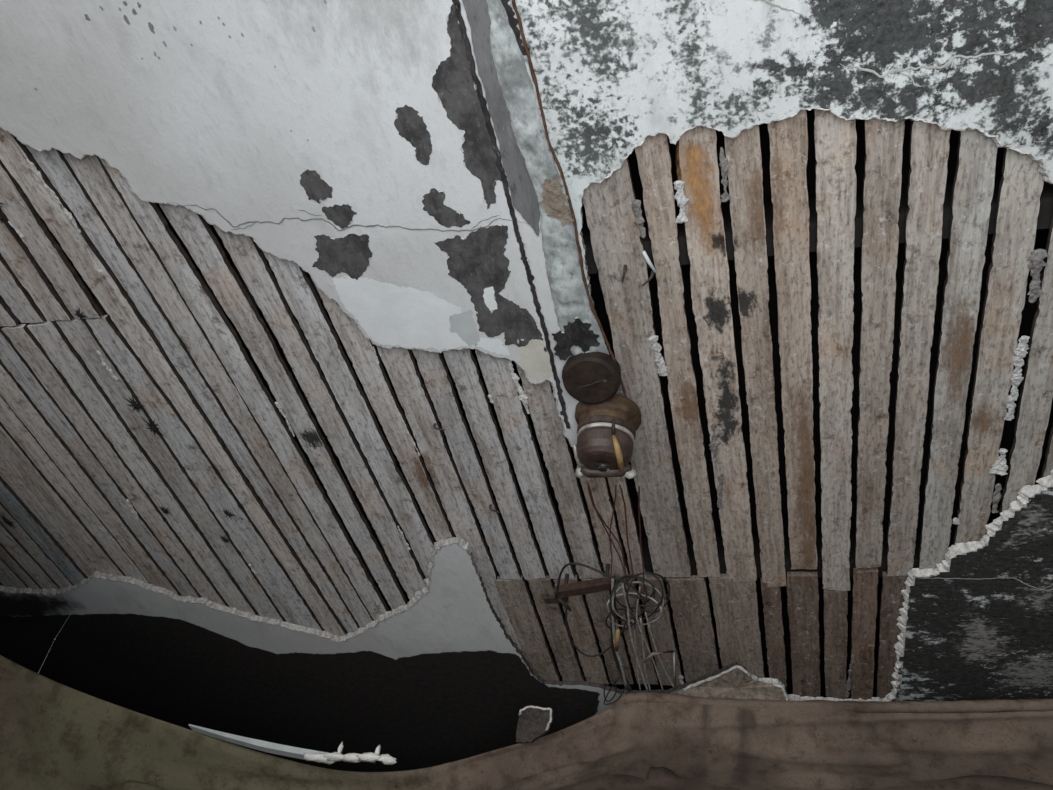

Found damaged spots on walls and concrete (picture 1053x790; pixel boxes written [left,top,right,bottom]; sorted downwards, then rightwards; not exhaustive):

mould [520,0,638,177]
leakage [664,0,1053,160]
crack [168,0,606,429]
leakage [712,233,738,257]
leakage [703,288,757,334]
flaking render [0,105,1053,702]
leakage [711,355,738,445]
leakage [892,487,1053,702]